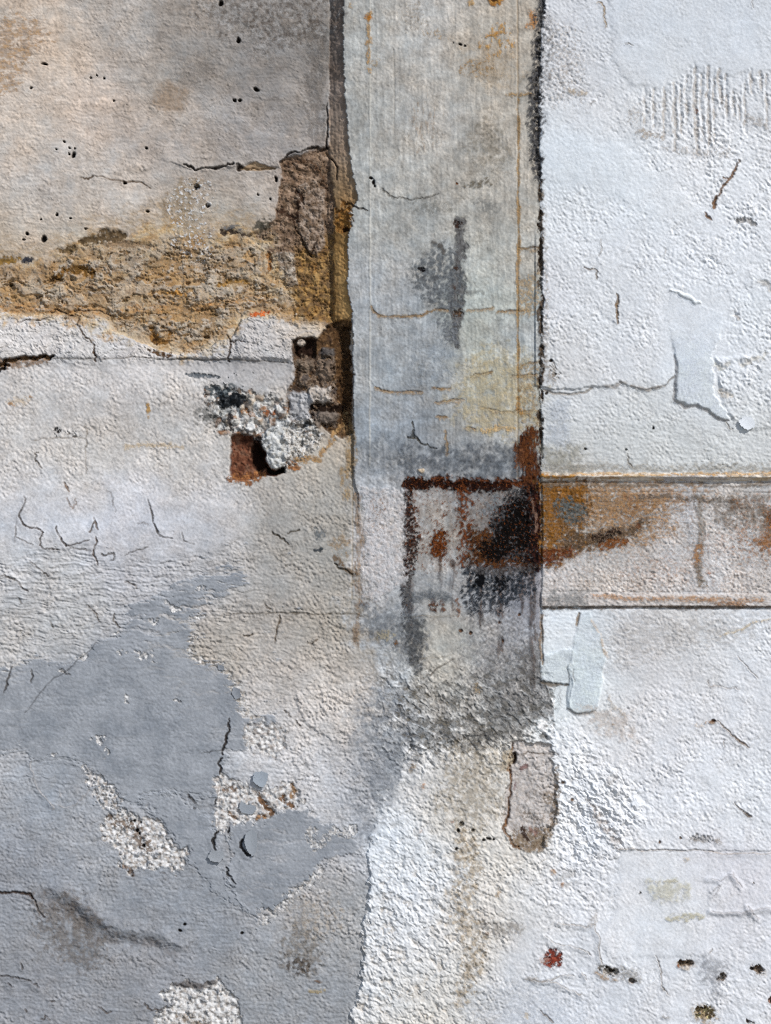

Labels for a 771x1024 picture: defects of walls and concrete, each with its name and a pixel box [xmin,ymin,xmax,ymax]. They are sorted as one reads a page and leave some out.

crack [184,163,250,171]
crack [0,309,288,371]
spalling [0,149,355,486]
damp [407,216,476,349]
corrosion [400,116,771,688]
crack [2,485,187,602]
damp [401,574,452,613]
spalling [82,764,189,876]
crack [211,828,253,884]
peeling [212,771,306,856]
spalling [457,740,559,852]
spalling [153,977,242,1024]